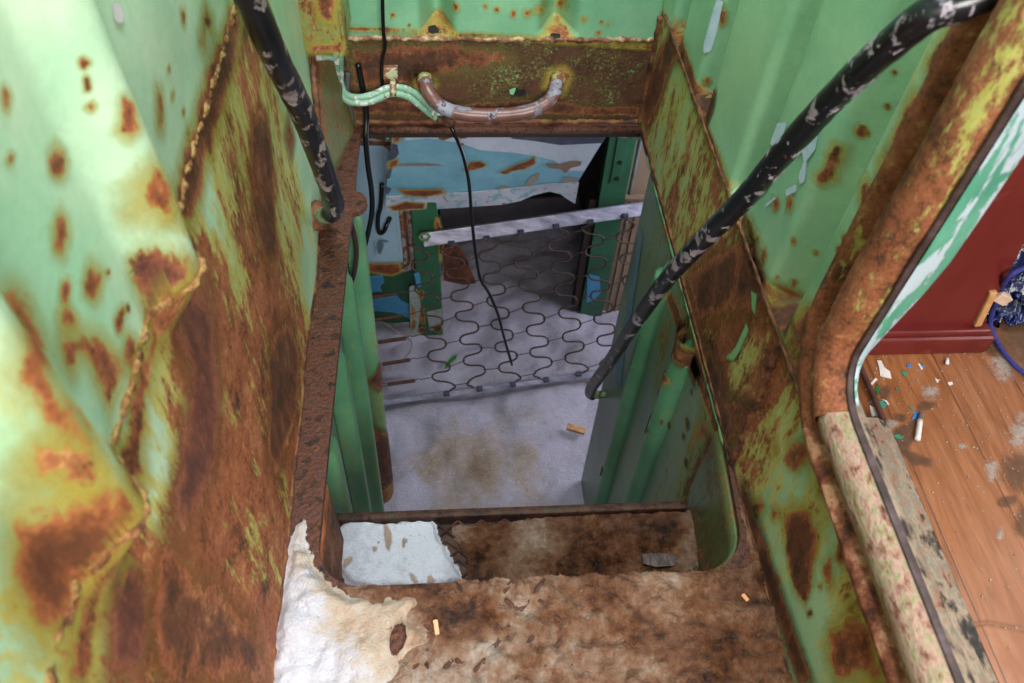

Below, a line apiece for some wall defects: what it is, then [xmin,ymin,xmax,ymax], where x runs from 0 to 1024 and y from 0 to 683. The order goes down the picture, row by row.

rust [116,95,139,139]
rust [125,4,242,227]
rust [250,107,278,268]
rust [308,0,523,116]
peeling [385,137,605,194]
rust [455,0,732,191]
peeling [703,0,723,53]
peeling [770,122,786,146]
peeling [766,135,818,206]
rust [2,246,270,683]
rust [740,481,845,683]
rust [827,606,885,683]